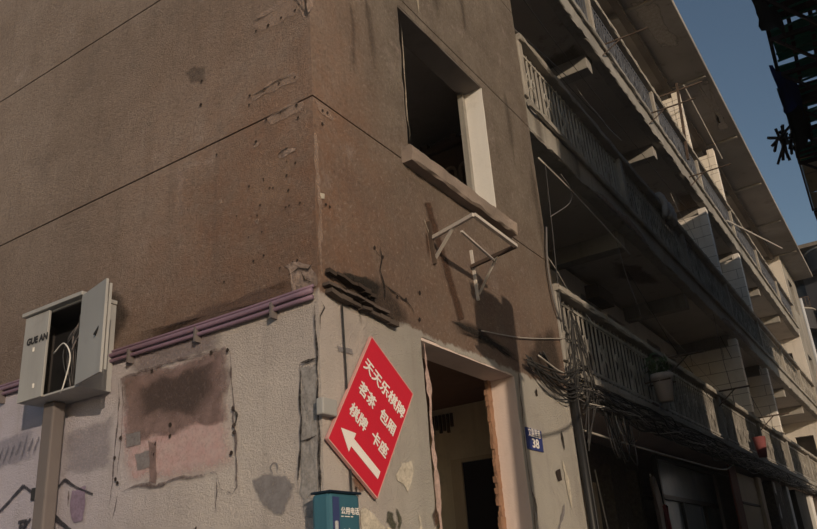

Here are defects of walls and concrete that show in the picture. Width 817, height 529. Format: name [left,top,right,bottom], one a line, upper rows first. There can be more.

peeling [110,346,238,515]
spalling [298,358,318,518]